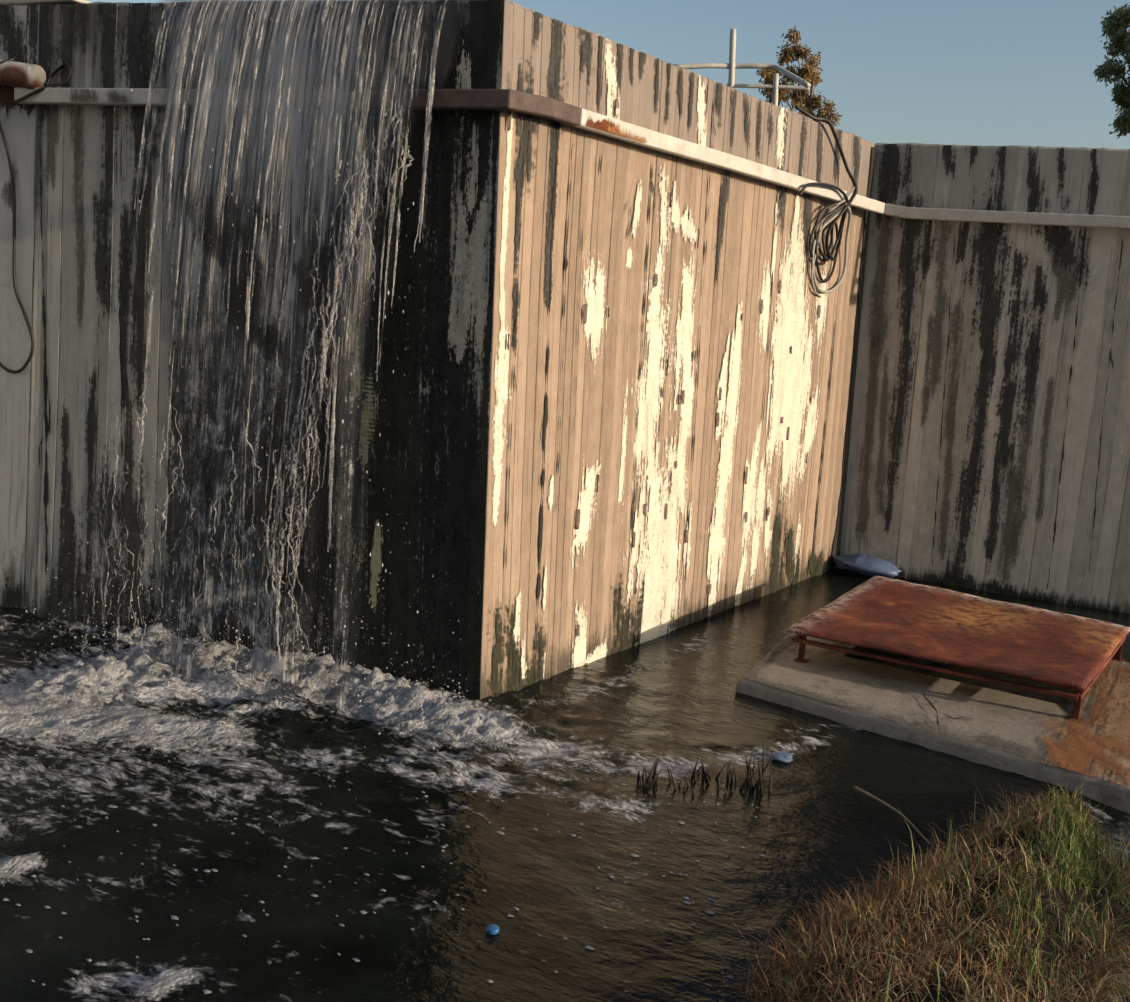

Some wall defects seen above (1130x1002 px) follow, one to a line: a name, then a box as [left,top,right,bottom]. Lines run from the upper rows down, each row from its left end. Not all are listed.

leakage [0,3,171,89]
peeling [455,39,472,89]
peeling [775,107,788,169]
leakage [33,104,500,700]
peeling [447,110,514,527]
peeling [581,243,610,379]
peeling [618,163,700,647]
peeling [705,185,829,617]
leakage [856,144,1120,612]
peeling [570,455,602,573]
peeling [569,600,608,668]
rust [1037,660,1130,785]